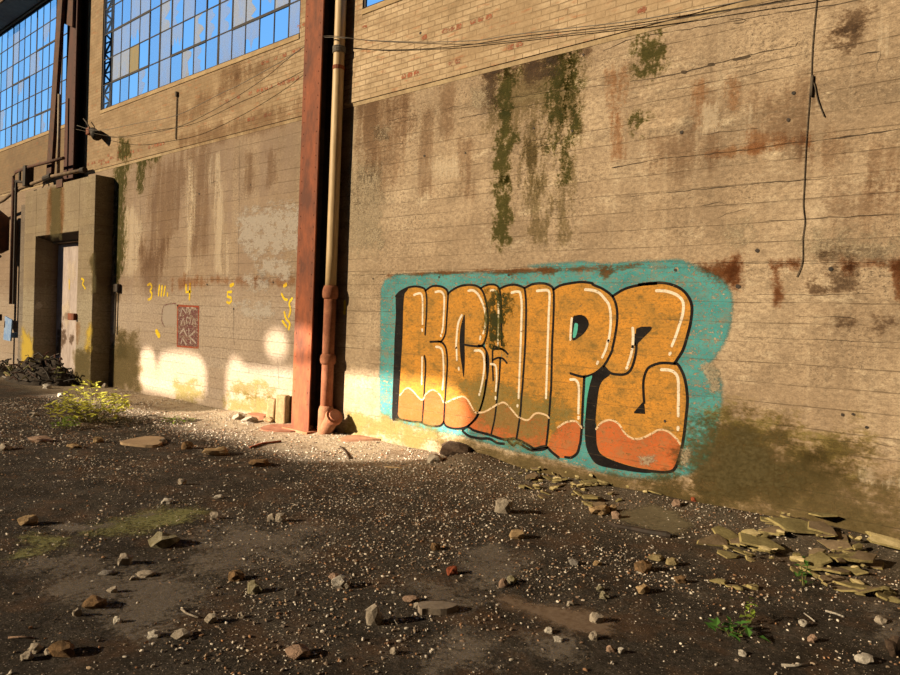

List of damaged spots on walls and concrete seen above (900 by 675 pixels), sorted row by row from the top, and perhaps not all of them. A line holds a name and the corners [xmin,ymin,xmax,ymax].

damp [492,111,519,243]
damp [548,112,580,183]